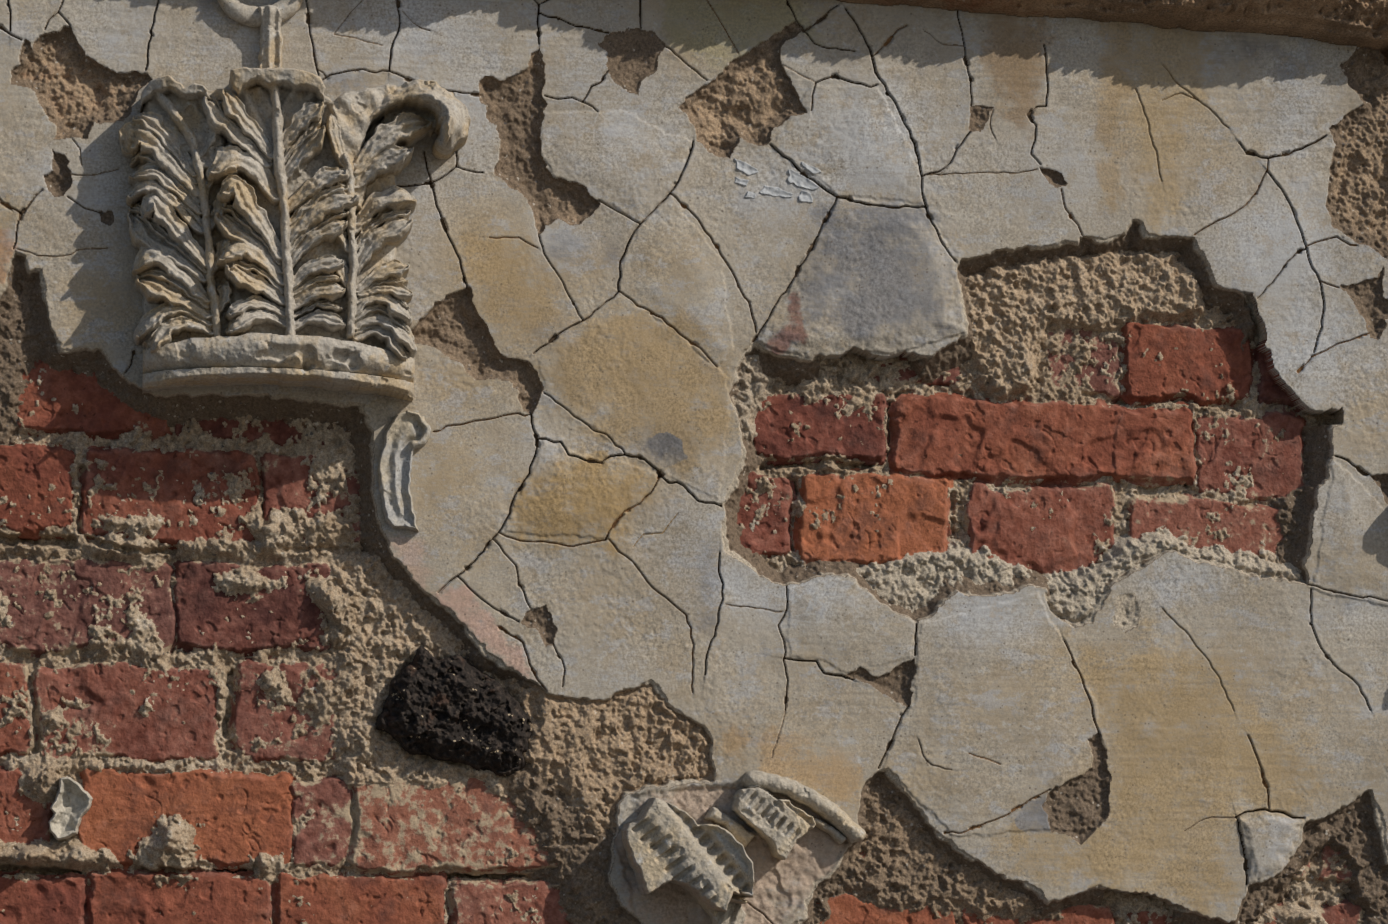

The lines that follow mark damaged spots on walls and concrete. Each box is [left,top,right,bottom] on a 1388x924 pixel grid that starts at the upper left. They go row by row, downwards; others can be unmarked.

spalling [11,25,153,197]
crack [305,0,430,82]
crack [397,152,483,289]
spalling [479,48,600,236]
crack [489,0,1082,367]
crack [1135,65,1385,374]
spalling [1326,47,1388,340]
spalling [721,219,1344,633]
spalling [0,250,717,924]
crack [433,393,853,758]
spalling [792,767,1388,924]
crack [1162,608,1304,885]